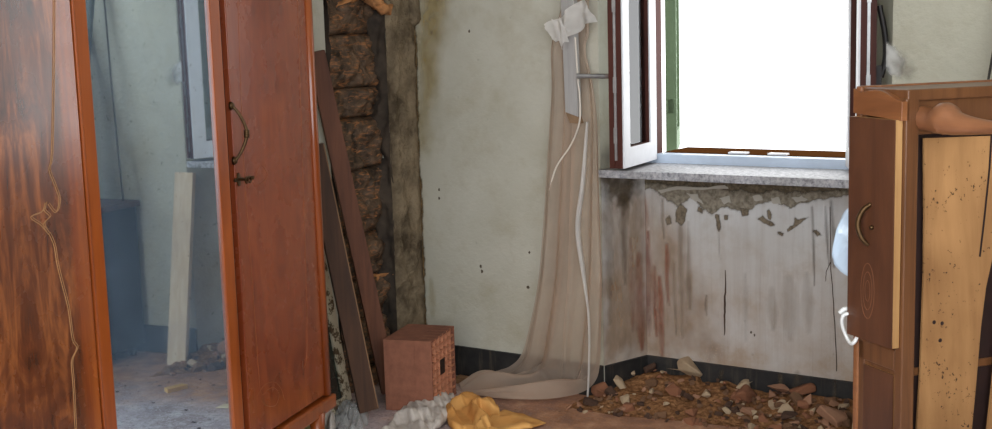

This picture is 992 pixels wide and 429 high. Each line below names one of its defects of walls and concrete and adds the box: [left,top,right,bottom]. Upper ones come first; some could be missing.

spalling [323,0,427,337]
leakage [601,178,640,271]
flaking render [645,179,849,236]
spalling [331,168,379,393]
crack [720,270,728,335]